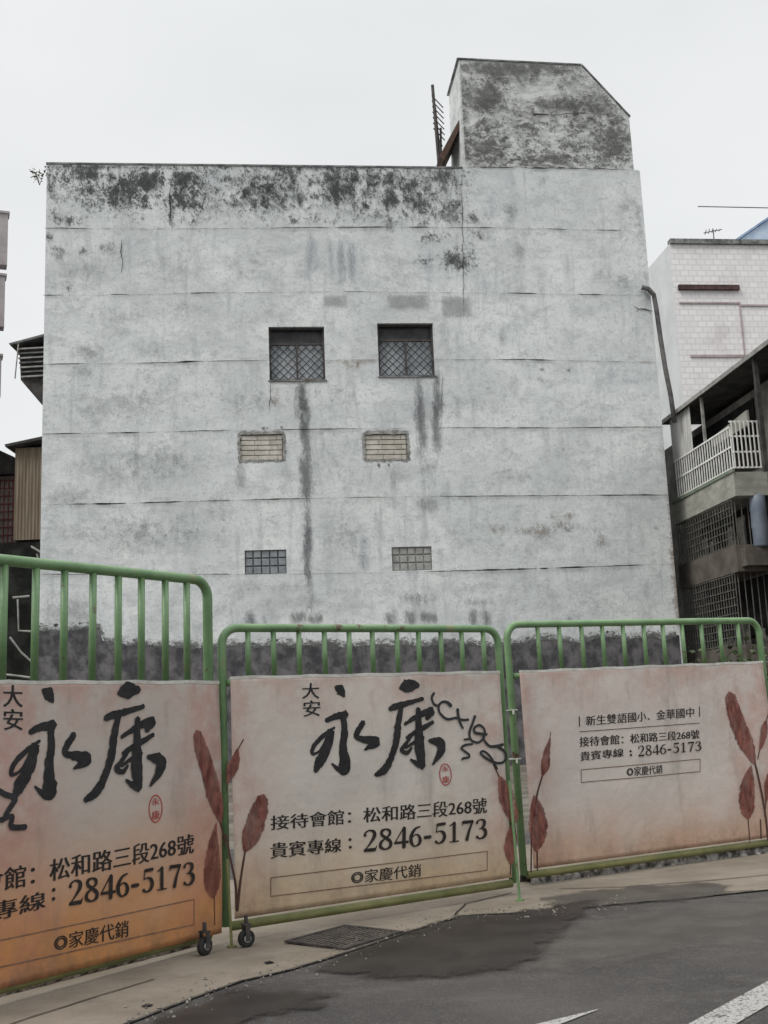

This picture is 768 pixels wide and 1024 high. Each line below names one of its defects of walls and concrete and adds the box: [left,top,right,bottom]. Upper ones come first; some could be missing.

damp [460,62,633,169]
crack [169,188,226,229]
damp [47,165,485,274]
crack [277,223,381,231]
damp [295,386,311,497]
damp [417,380,441,446]